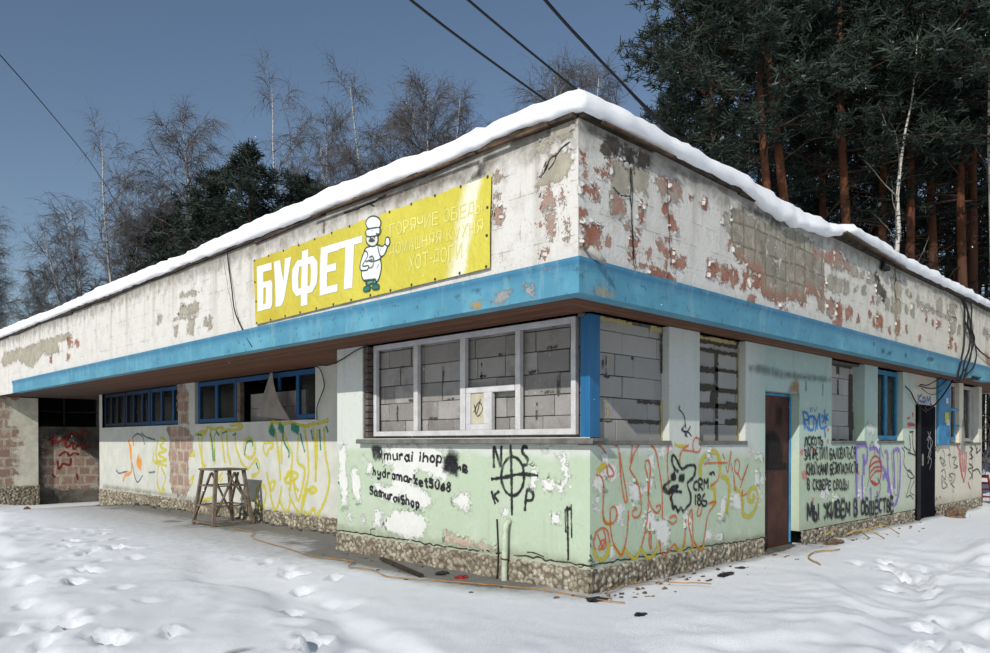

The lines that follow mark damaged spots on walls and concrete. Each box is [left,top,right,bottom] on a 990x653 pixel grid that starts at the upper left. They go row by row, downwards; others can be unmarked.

spalling [534,121,709,282]
crack [613,162,635,267]
peeling [1,330,80,369]
peeling [156,287,213,338]
spalling [706,203,990,352]
spalling [0,393,24,487]
spalling [167,384,194,498]
peeling [337,442,450,543]
peeling [449,491,473,515]
peeling [441,528,500,556]
peeling [528,444,572,499]
peeling [549,511,564,527]